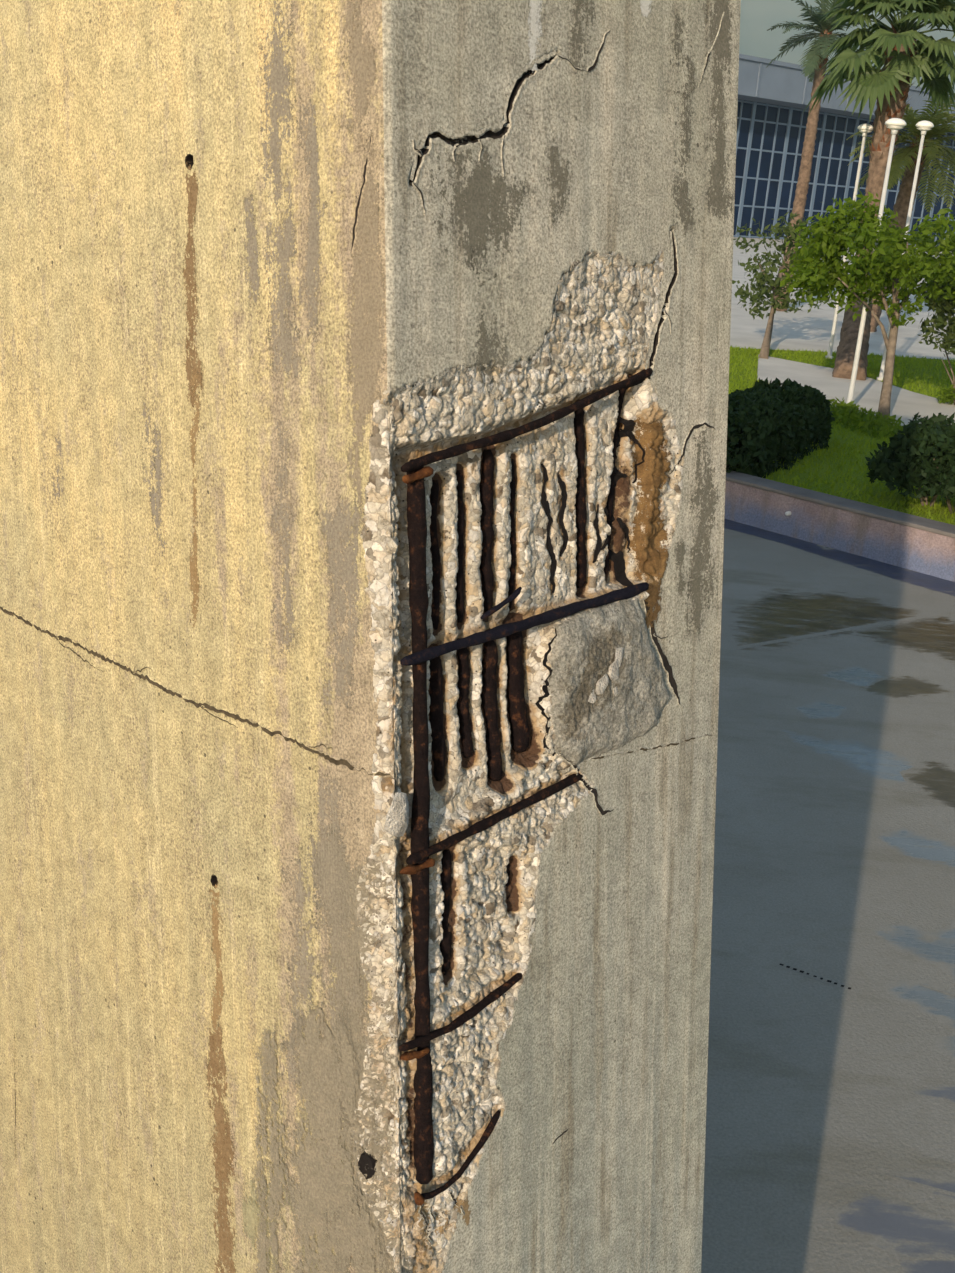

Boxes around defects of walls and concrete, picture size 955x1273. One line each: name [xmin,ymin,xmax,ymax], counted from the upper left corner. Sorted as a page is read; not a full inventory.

crack [409,30,610,215]
rust [183,163,203,628]
crack [0,604,394,780]
spalling [242,0,685,1273]
crack [535,628,715,816]
crack [541,230,716,707]
rust [626,417,674,630]
rust [206,883,236,1273]